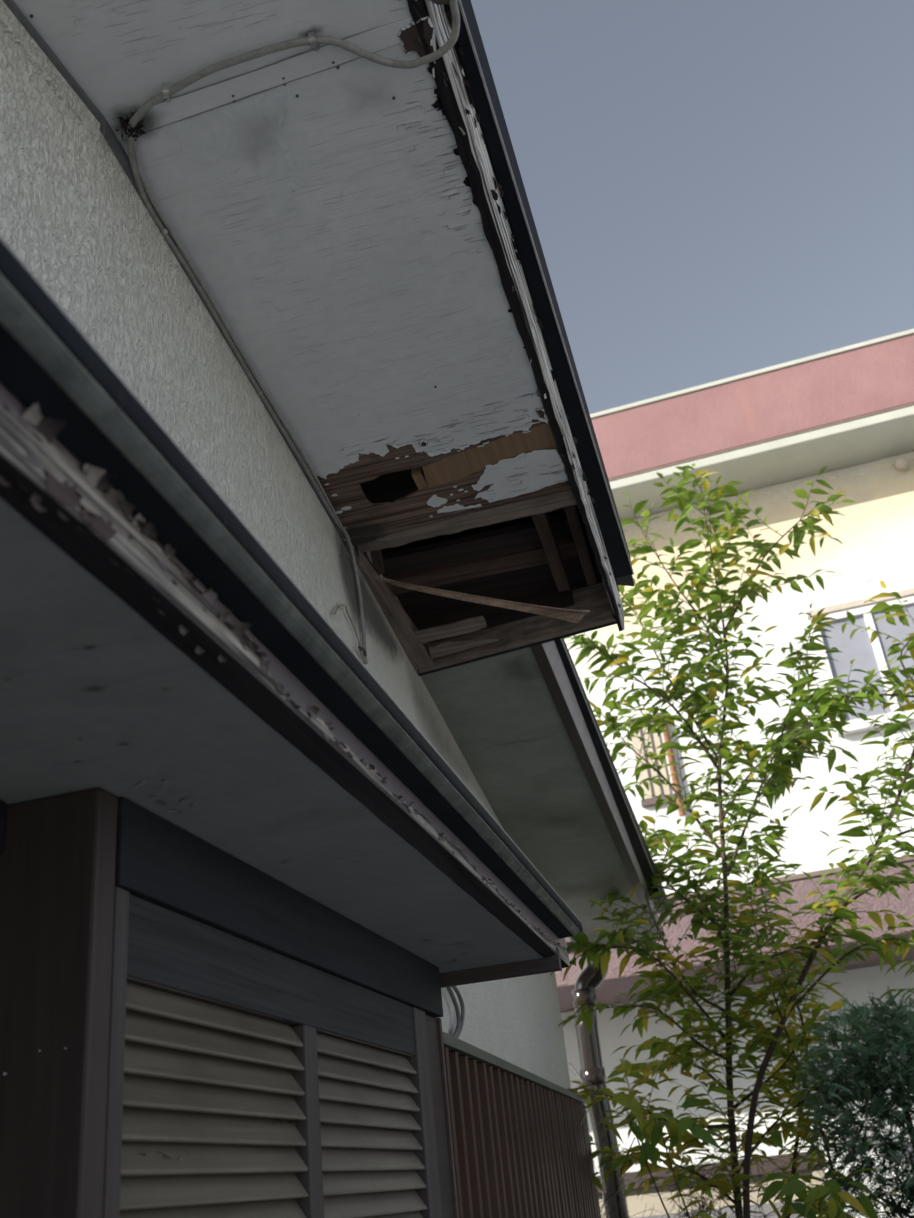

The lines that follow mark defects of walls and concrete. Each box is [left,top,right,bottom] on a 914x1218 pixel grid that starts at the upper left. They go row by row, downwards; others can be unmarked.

peeling [397,0,485,207]
peeling [490,176,507,219]
peeling [374,370,595,517]
peeling [0,403,570,966]